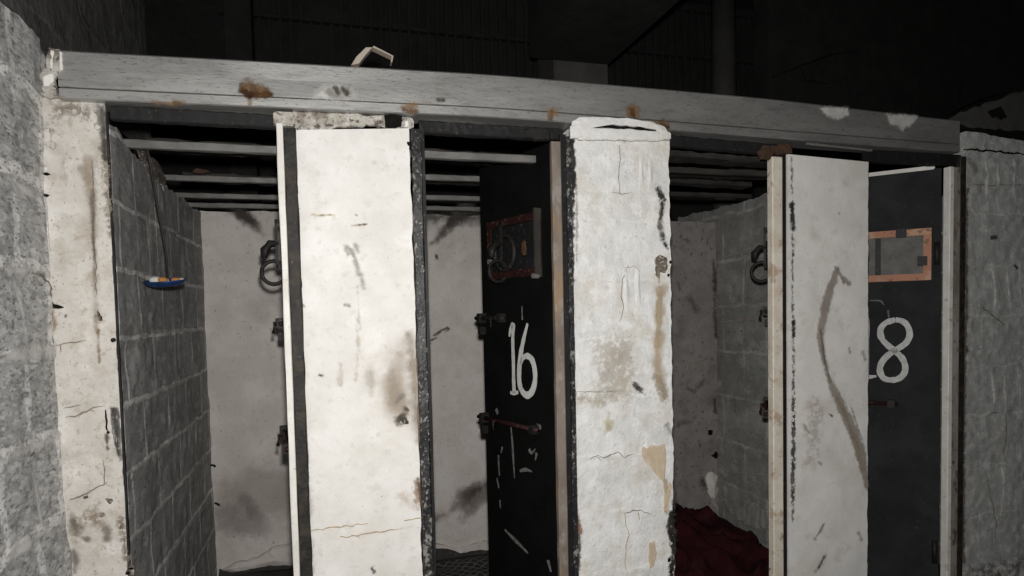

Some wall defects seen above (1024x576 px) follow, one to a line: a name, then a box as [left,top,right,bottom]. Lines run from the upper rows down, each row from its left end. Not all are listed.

corrosion [239,79,273,105]
corrosion [627,105,639,119]
peeling [821,107,849,119]
peeling [887,114,918,131]
leakage [653,286,667,399]
peeling [642,442,677,576]
crack [312,517,422,538]